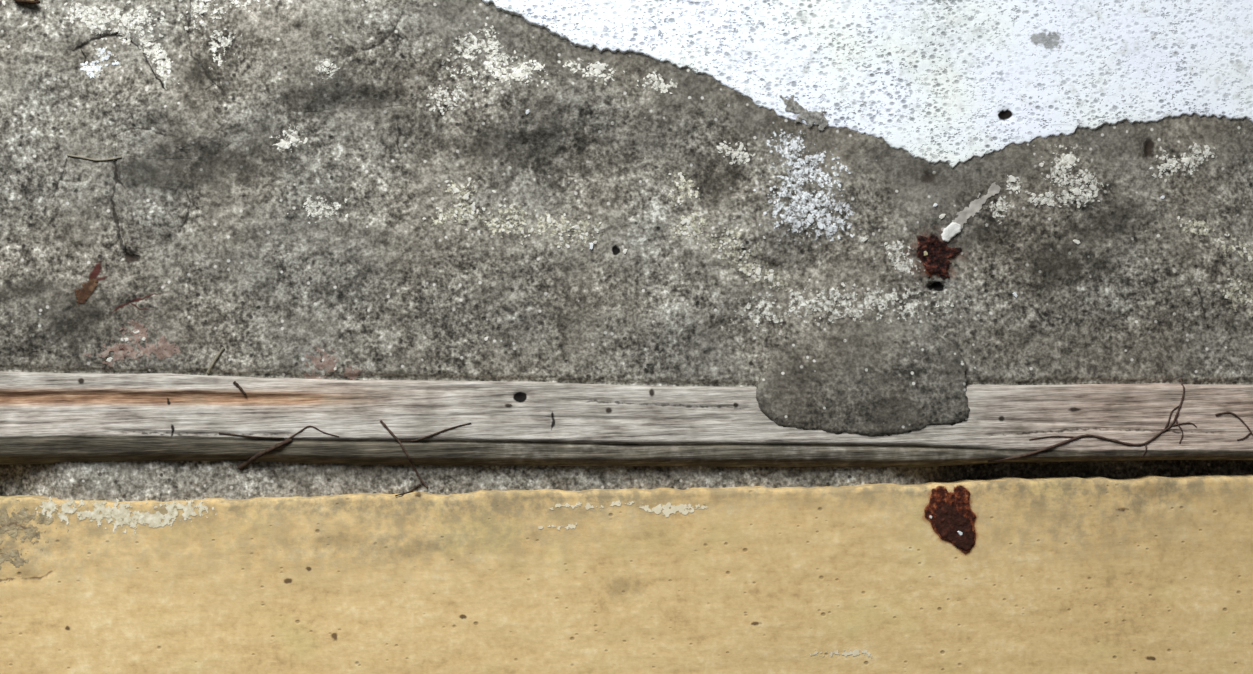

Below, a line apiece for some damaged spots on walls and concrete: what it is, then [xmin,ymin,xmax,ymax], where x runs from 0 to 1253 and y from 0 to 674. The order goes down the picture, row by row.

spalling [0,0,1253,387]
corrosion [916,234,962,279]
spalling [0,460,1253,583]
corrosion [924,485,976,553]